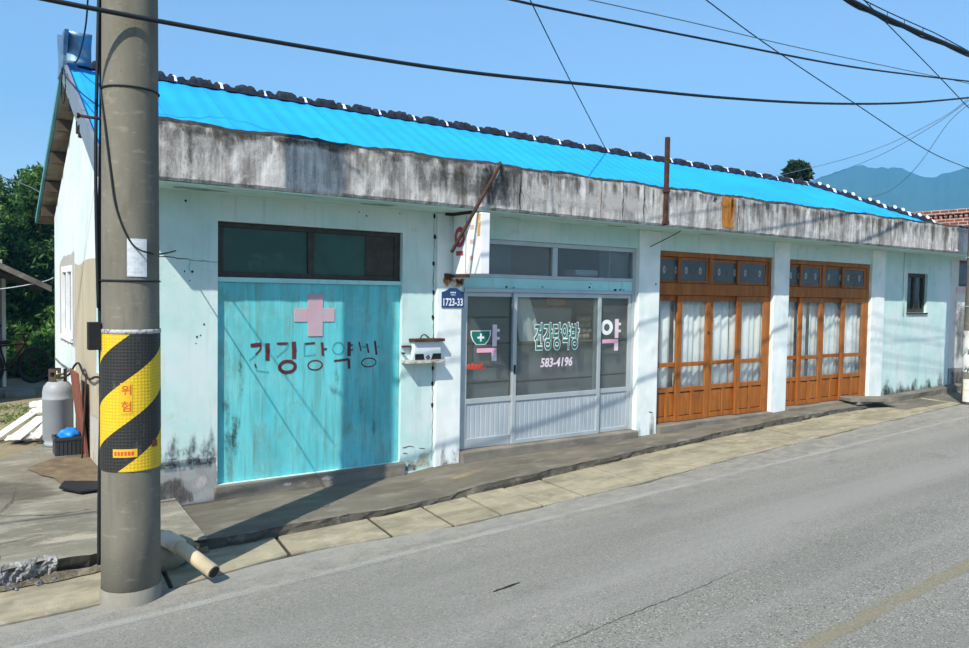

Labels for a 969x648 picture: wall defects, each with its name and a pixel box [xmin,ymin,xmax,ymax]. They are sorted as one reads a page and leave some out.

leakage [176,123,358,172]
leakage [376,150,643,212]
corrosion [721,195,736,228]
leakage [956,308,965,358]
leakage [883,372,962,395]
leakage [160,438,215,469]
spalling [0,553,59,591]